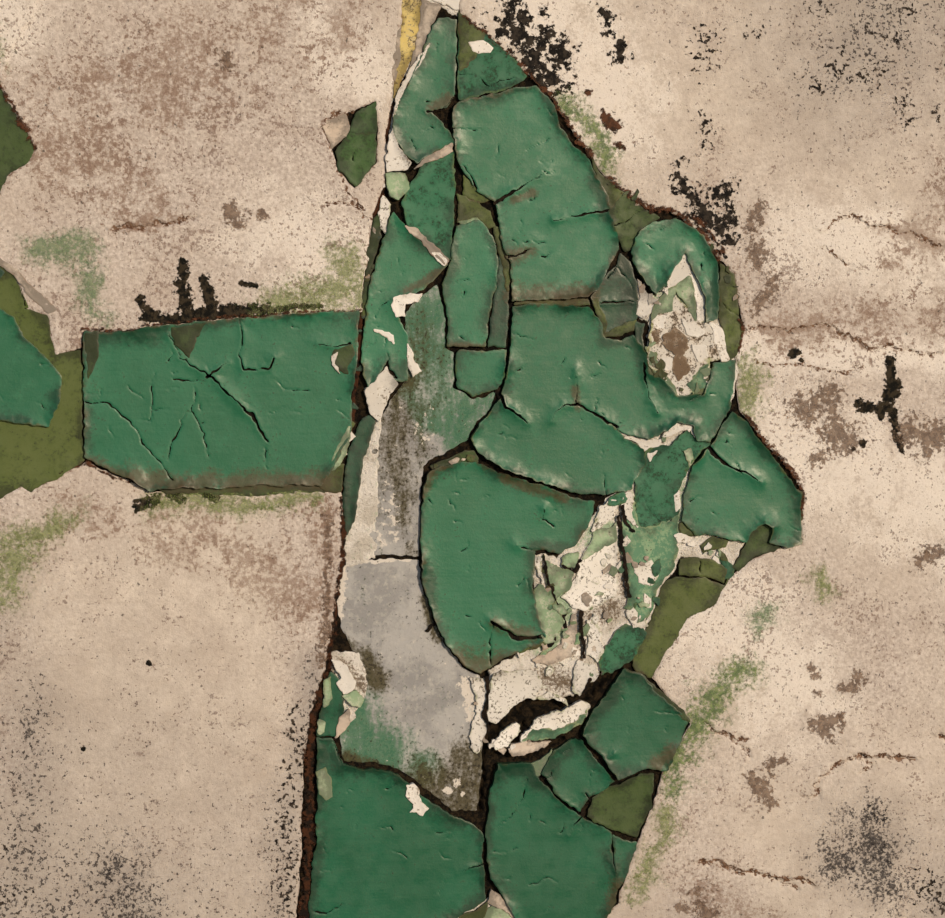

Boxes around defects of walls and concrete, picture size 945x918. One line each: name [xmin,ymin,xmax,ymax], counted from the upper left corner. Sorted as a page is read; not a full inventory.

leakage [472,0,593,101]
leakage [589,1,634,66]
peeling [0,88,35,191]
crack [320,76,406,234]
leakage [600,108,626,151]
leakage [135,254,324,325]
peeling [0,258,362,499]
peeling [308,0,805,918]
crack [747,322,943,376]
leakage [783,353,945,470]
crack [813,753,916,796]
crack [698,858,816,890]